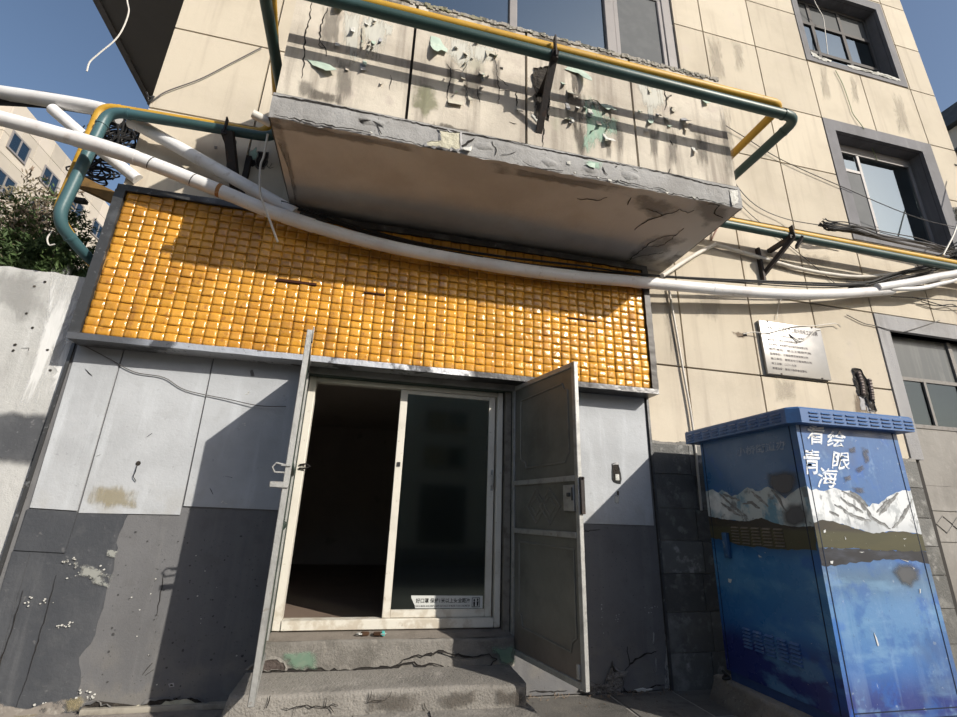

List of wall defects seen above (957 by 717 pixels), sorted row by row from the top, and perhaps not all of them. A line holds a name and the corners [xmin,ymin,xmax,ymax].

peeling [308,11,393,71]
peeling [430,36,498,105]
peeling [565,66,592,81]
crack [272,3,737,261]
peeling [561,82,620,182]
peeling [638,84,696,152]
peeling [0,667,208,717]
crack [266,696,338,716]
crack [262,650,497,703]
crack [623,647,661,693]